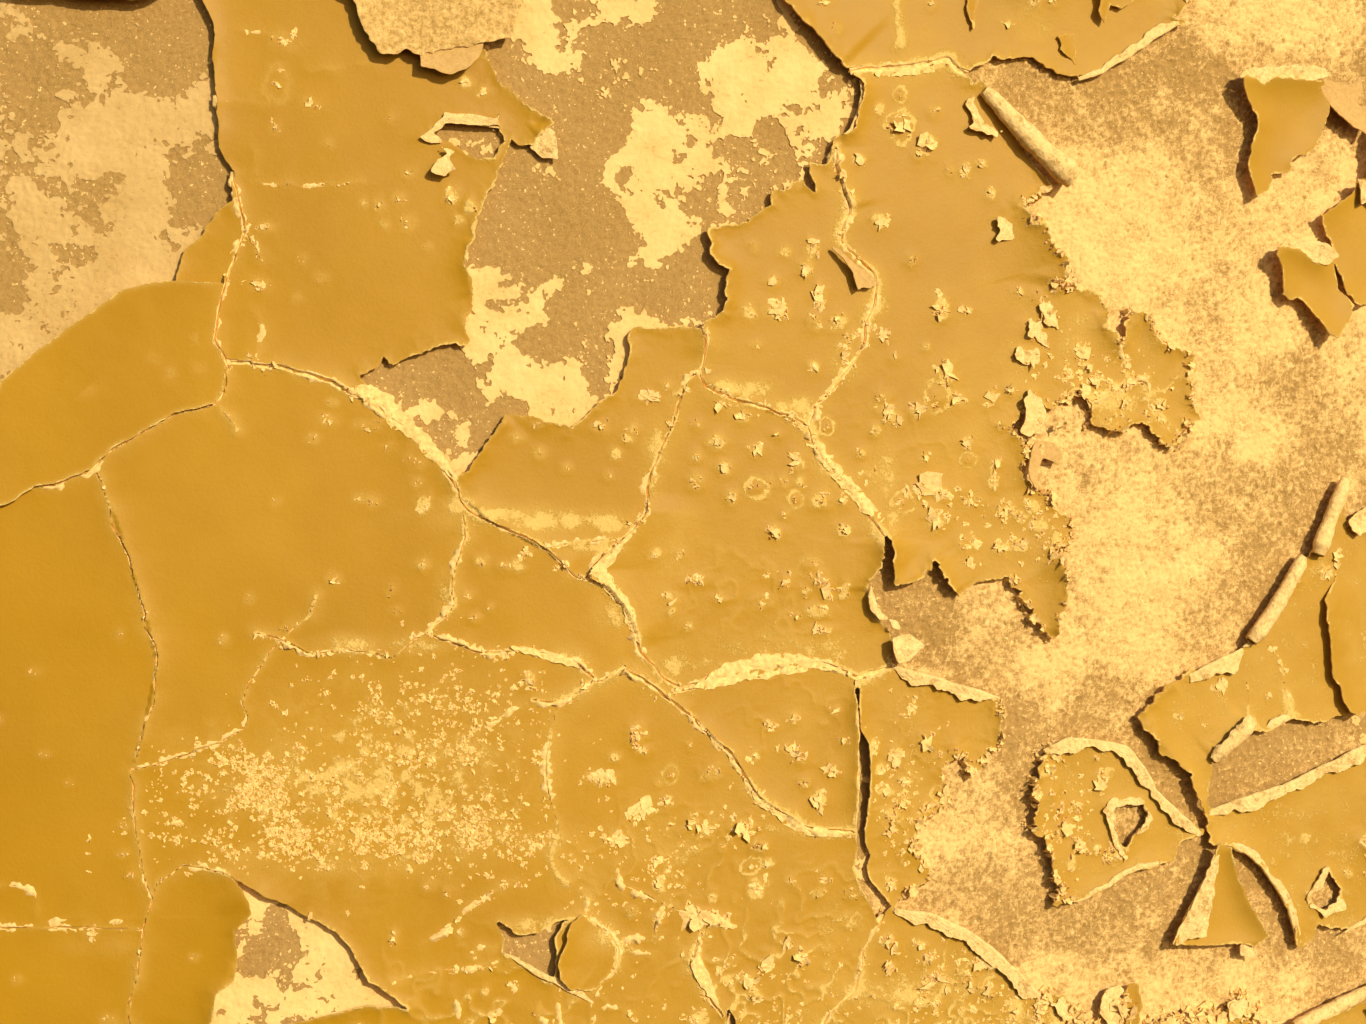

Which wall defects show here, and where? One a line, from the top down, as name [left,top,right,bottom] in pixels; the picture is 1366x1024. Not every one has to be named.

peeling [0,0,234,506]
crack [211,94,219,109]
peeling [353,0,864,477]
crack [0,149,892,1024]
peeling [852,0,1366,1024]
peeling [211,880,407,1024]
peeling [497,914,616,1004]